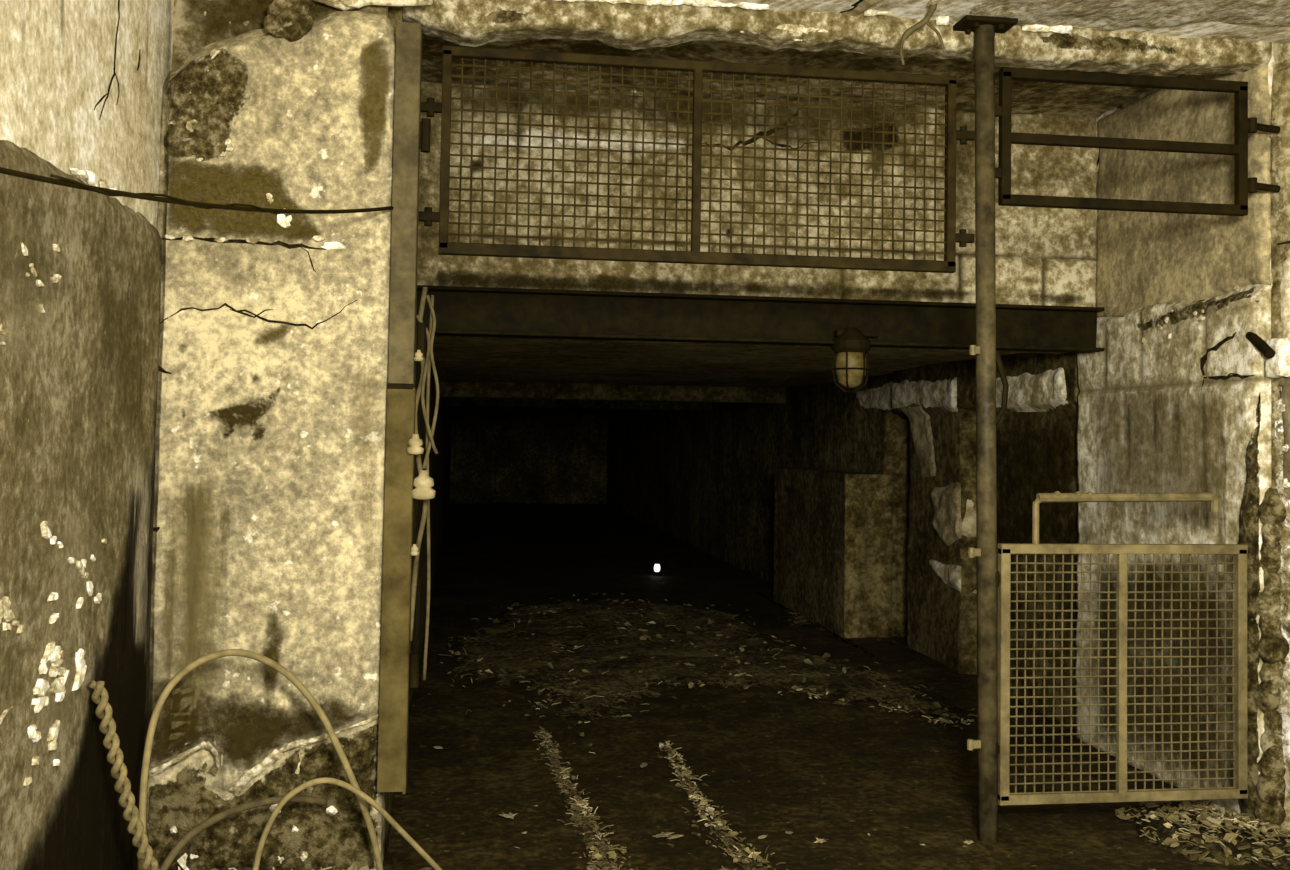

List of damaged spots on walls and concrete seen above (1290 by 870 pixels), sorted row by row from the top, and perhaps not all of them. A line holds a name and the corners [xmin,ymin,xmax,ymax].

spalling [264,0,432,42]
crack [840,0,883,17]
peeling [163,49,346,250]
leakage [359,41,389,170]
crack [160,300,357,329]
leakage [22,0,354,870]
spalling [1237,386,1290,827]